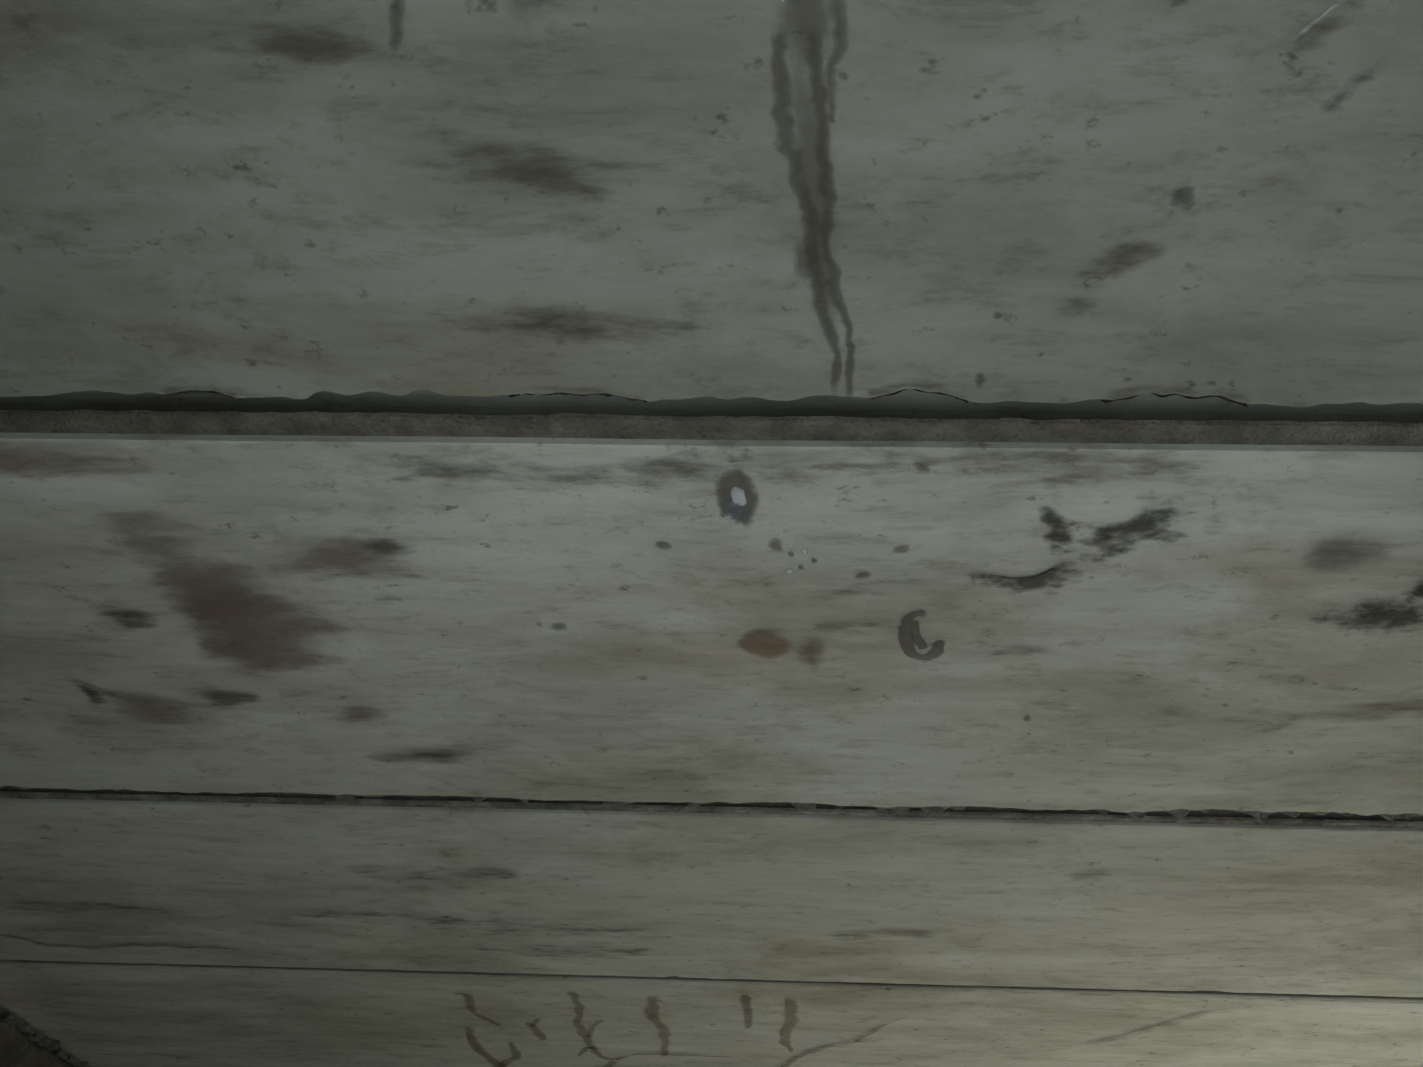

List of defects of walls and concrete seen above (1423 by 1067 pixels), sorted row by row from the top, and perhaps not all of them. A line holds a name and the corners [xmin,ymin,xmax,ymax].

leakage [1042,508,1071,548]
leakage [1088,510,1174,561]
leakage [979,568,1072,590]
leakage [205,693,255,705]